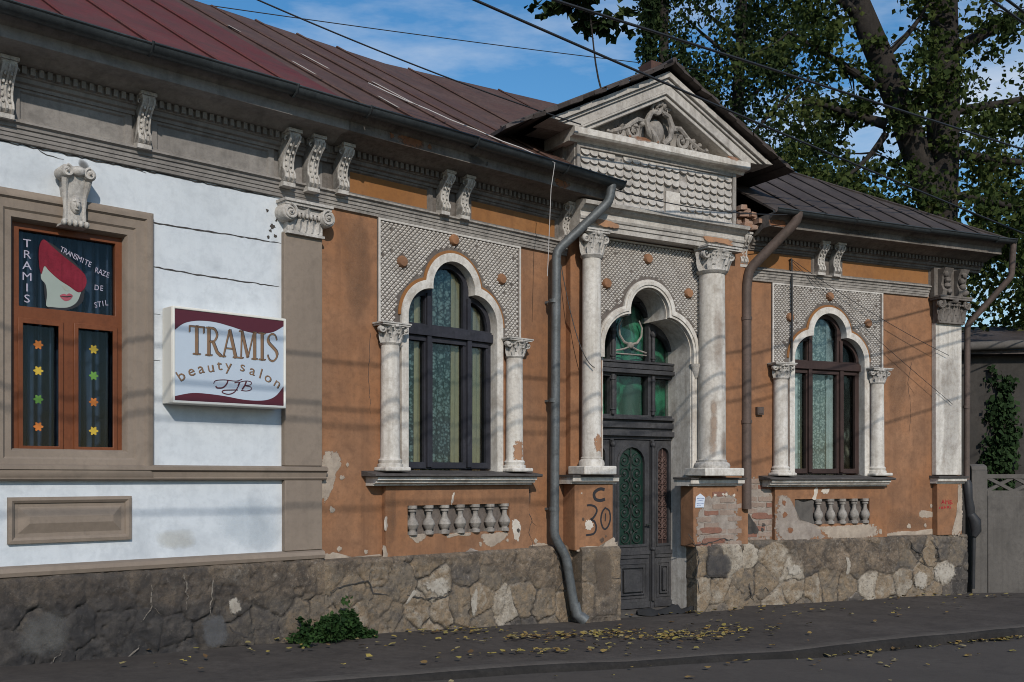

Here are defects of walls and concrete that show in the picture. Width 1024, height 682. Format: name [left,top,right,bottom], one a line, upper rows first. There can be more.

peeling [513,441,523,460]
peeling [322,451,349,513]
flaking render [696,477,933,547]
flaking render [447,519,521,552]
crack [332,576,452,604]